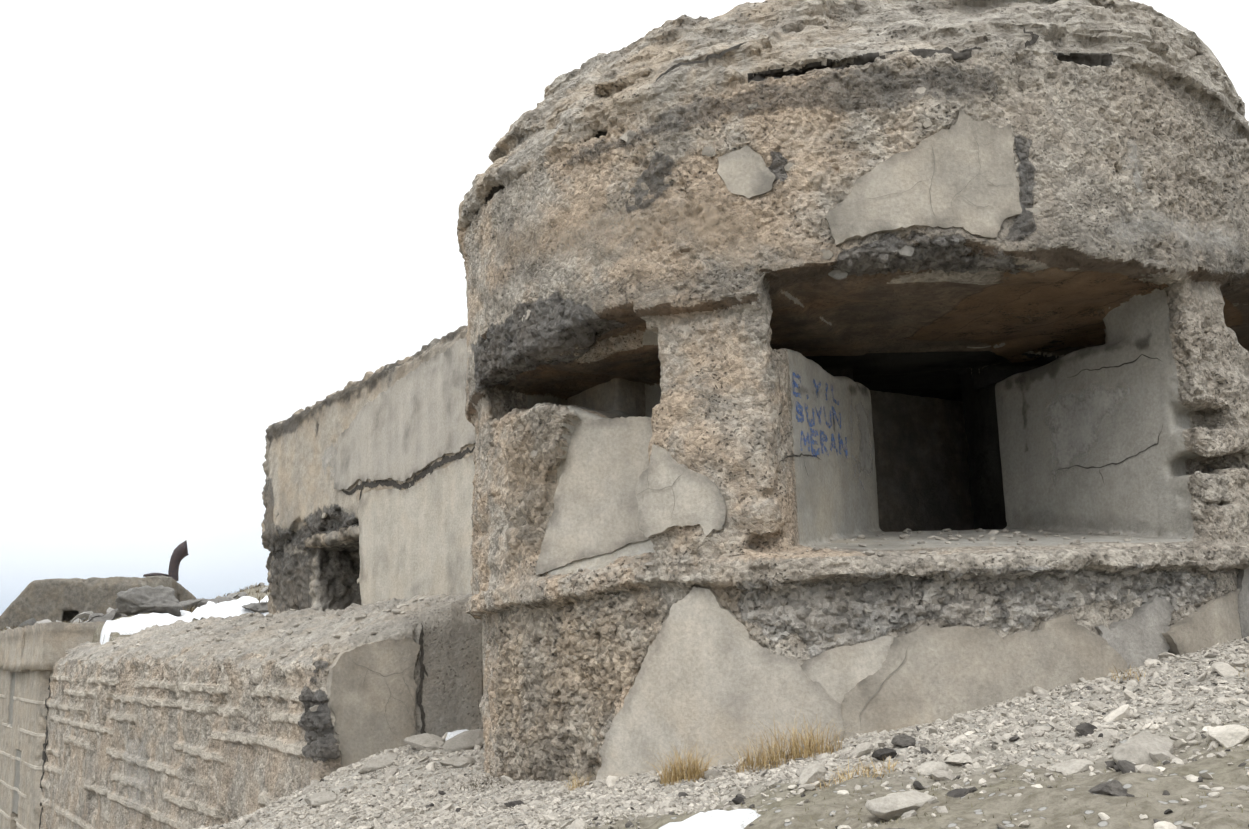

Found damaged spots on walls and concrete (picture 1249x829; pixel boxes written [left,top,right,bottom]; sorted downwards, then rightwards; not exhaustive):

crack [655,43,981,83]
crack [1023,28,1113,67]
crack [585,131,607,142]
crack [470,184,505,225]
crack [342,446,475,500]
peeling [275,291,627,605]
peeling [504,406,727,575]
crack [1056,426,1163,483]
crack [353,623,428,735]
peeling [481,563,1242,797]
peeling [901,782,941,819]
peeling [1141,814,1177,829]